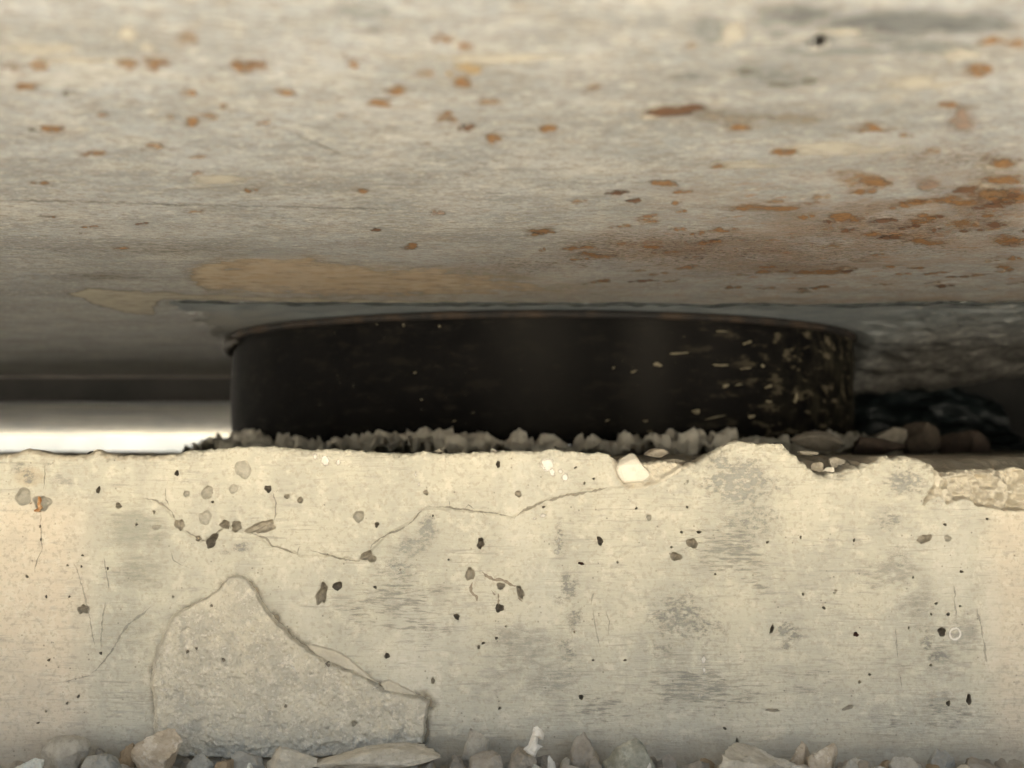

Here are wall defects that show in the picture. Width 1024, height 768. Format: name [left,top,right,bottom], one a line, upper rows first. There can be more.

rust [118,58,170,72]
rust [230,59,266,73]
rust [446,64,481,88]
rust [368,86,405,107]
rust [186,104,225,127]
rust [438,111,476,132]
rust [646,104,818,131]
rust [857,123,886,132]
rust [650,180,692,213]
rust [726,146,1024,292]
rust [493,214,738,284]
spalling [922,466,1024,512]